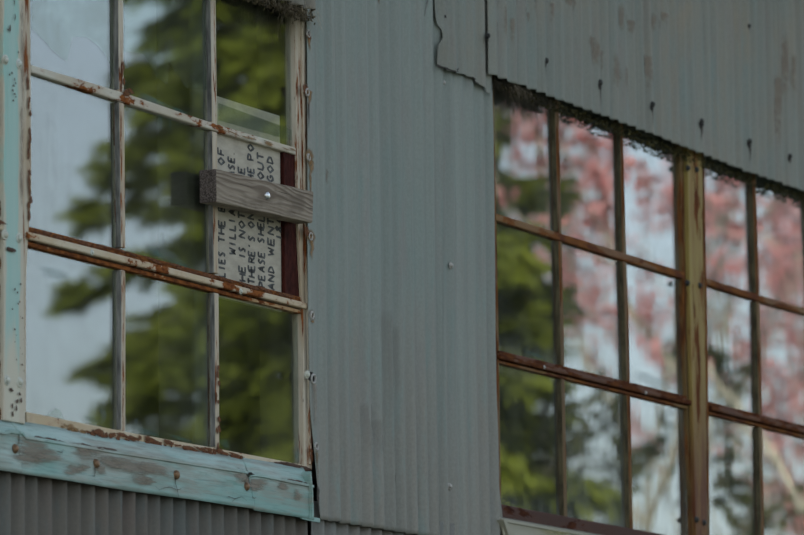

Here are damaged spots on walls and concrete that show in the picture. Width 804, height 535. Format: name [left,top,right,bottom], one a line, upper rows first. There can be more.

rust [34,231,294,298]
peeling [66,443,167,485]